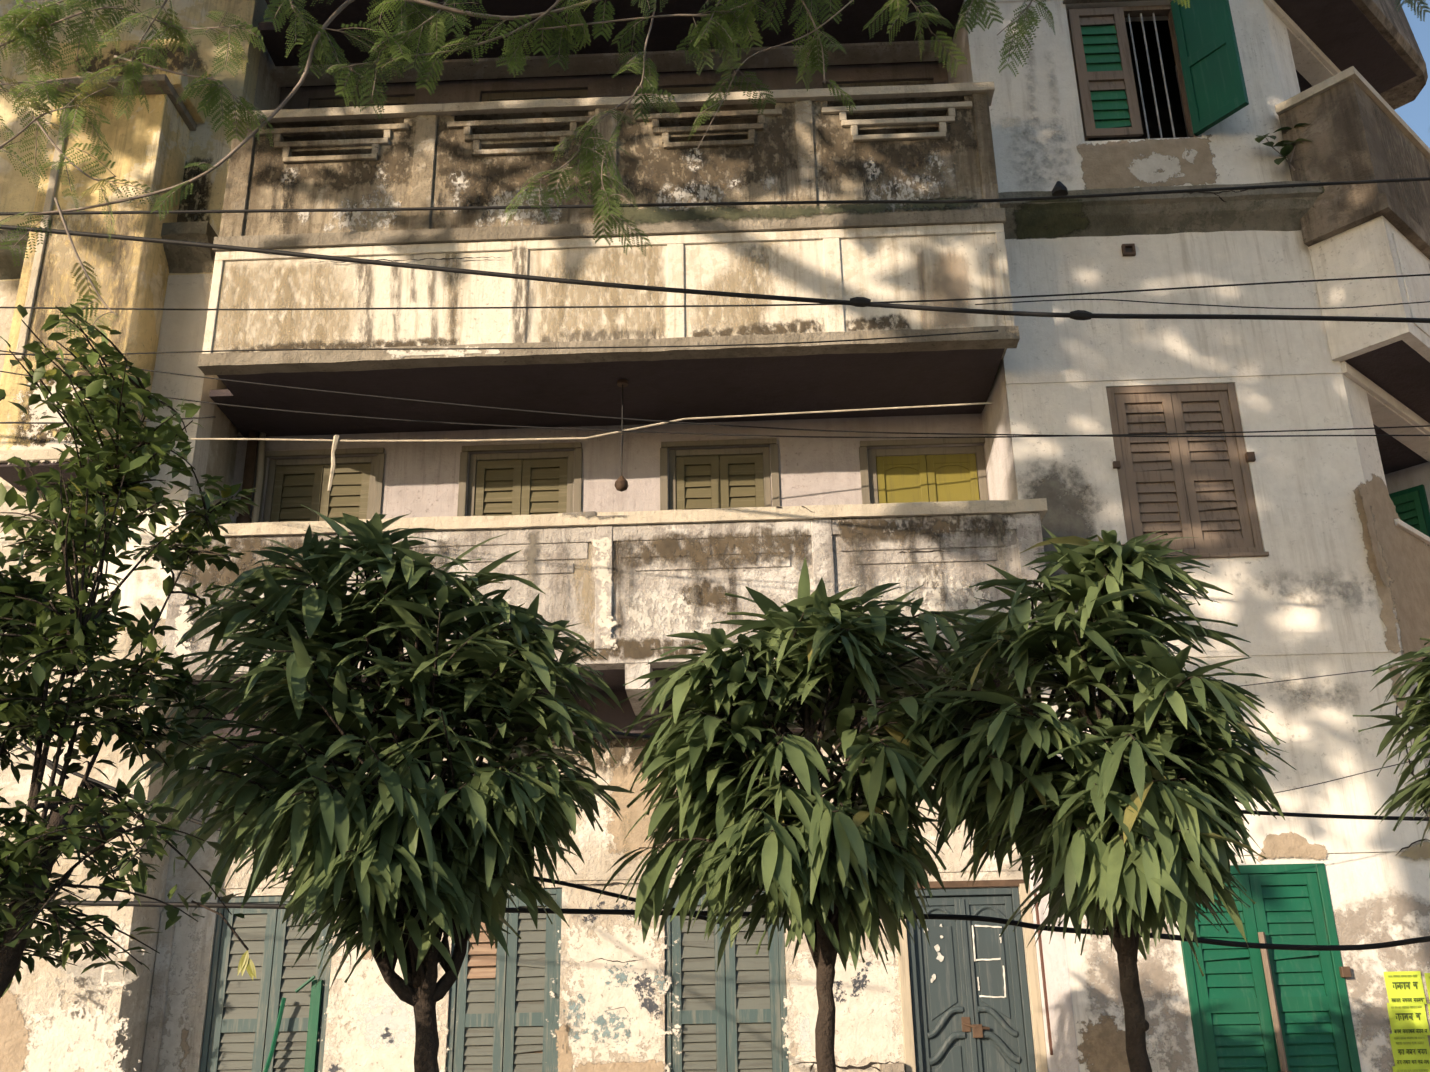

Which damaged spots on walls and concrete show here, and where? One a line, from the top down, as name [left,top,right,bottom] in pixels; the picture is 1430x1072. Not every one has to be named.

damp [603,164,978,226]
spalling [1077,134,1218,190]
damp [211,253,458,353]
damp [540,246,664,337]
damp [562,528,809,661]
damp [837,514,1012,605]
damp [1026,466,1095,589]
peeling [1258,832,1327,860]
peeling [0,920,145,1072]
peeling [546,901,681,1072]
spalling [1077,919,1130,1072]
flaking render [1137,926,1191,1072]